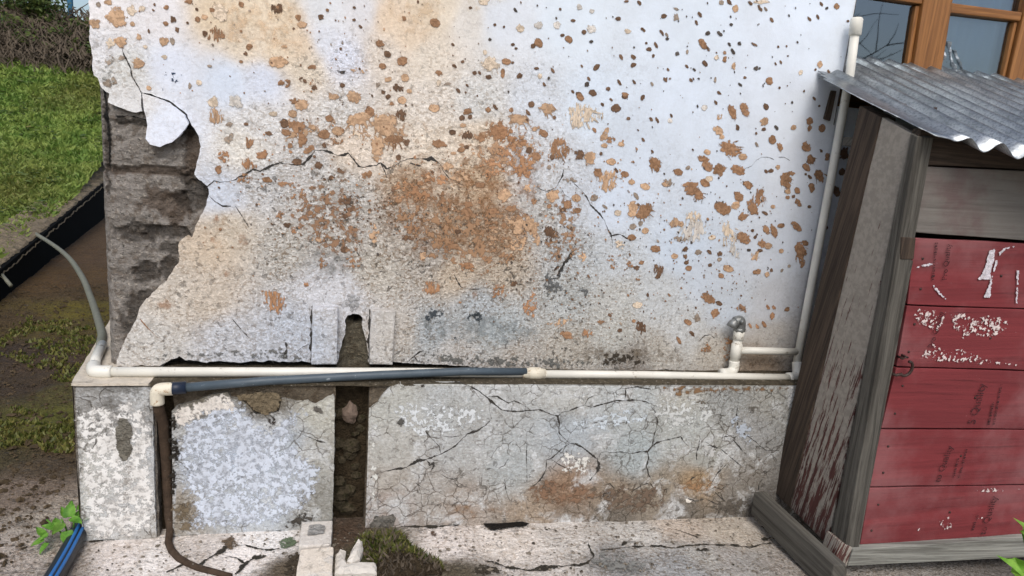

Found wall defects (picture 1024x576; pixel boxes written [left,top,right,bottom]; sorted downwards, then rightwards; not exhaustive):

crack [121,47,141,92]
spalling [100,86,209,365]
corrosion [281,177,364,267]
crack [207,150,462,227]
corrosion [387,121,549,274]
crack [554,244,576,275]
crack [535,169,627,248]
water stain [168,413,192,531]
crack [370,381,779,508]
water stain [285,513,315,528]
crack [486,526,772,571]